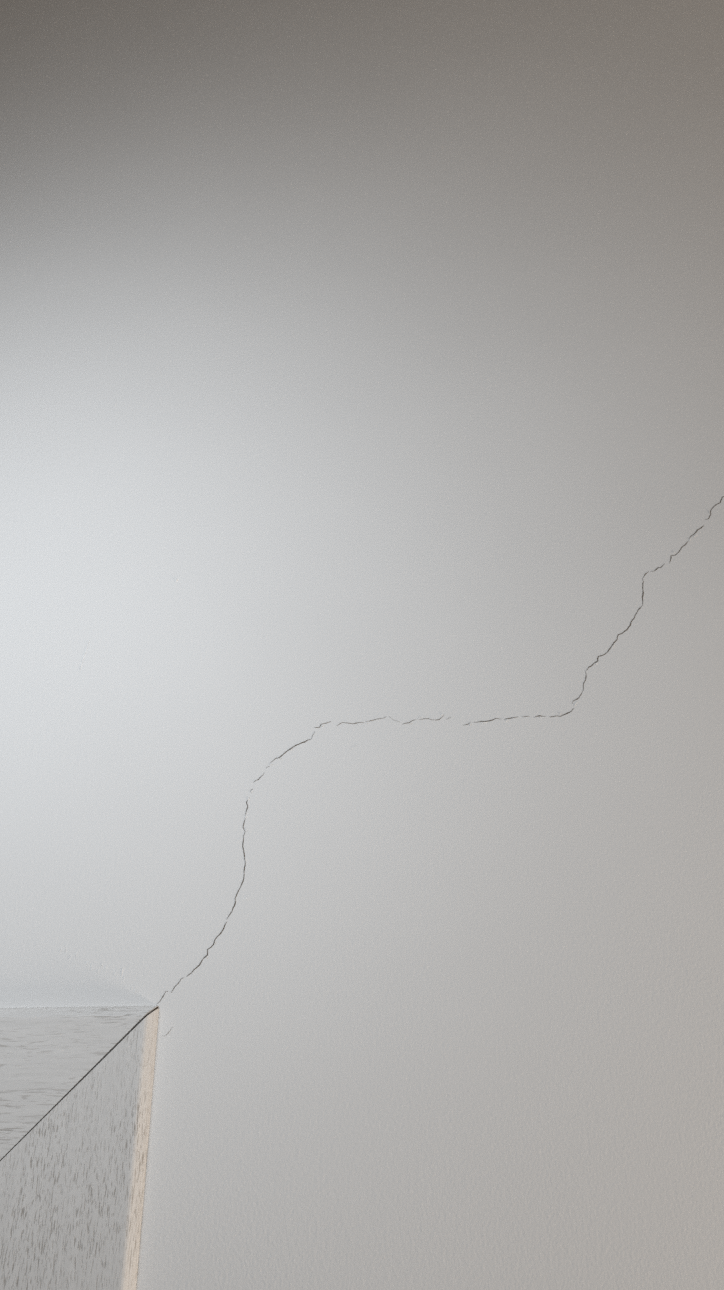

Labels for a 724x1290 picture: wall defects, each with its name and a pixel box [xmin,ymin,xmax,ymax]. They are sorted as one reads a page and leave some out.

crack [156,496,724,1036]